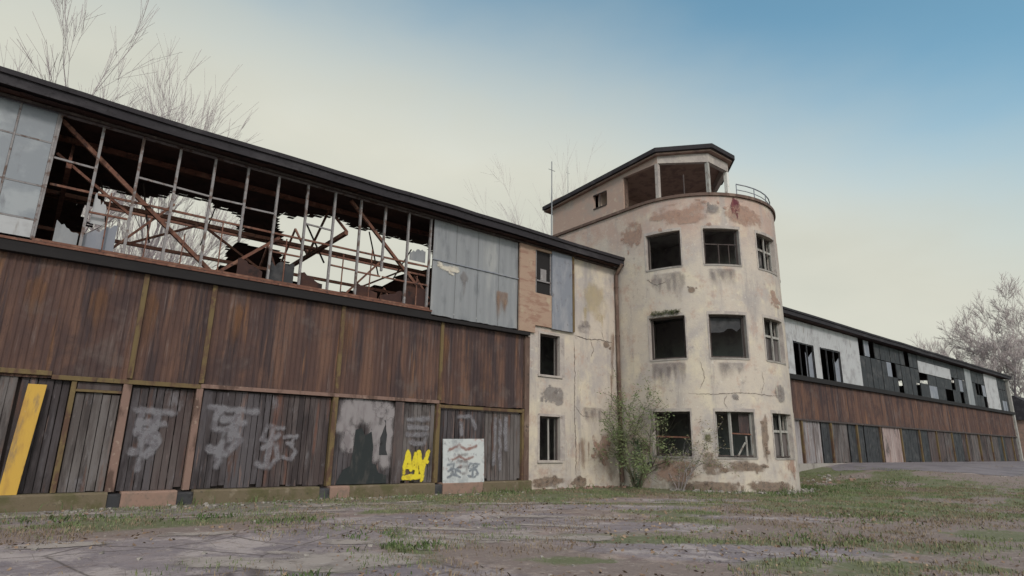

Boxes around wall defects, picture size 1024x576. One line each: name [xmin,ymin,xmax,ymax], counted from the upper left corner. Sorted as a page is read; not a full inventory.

flaking render [621,199,761,254]
crack [574,335,612,468]
crack [691,362,781,408]